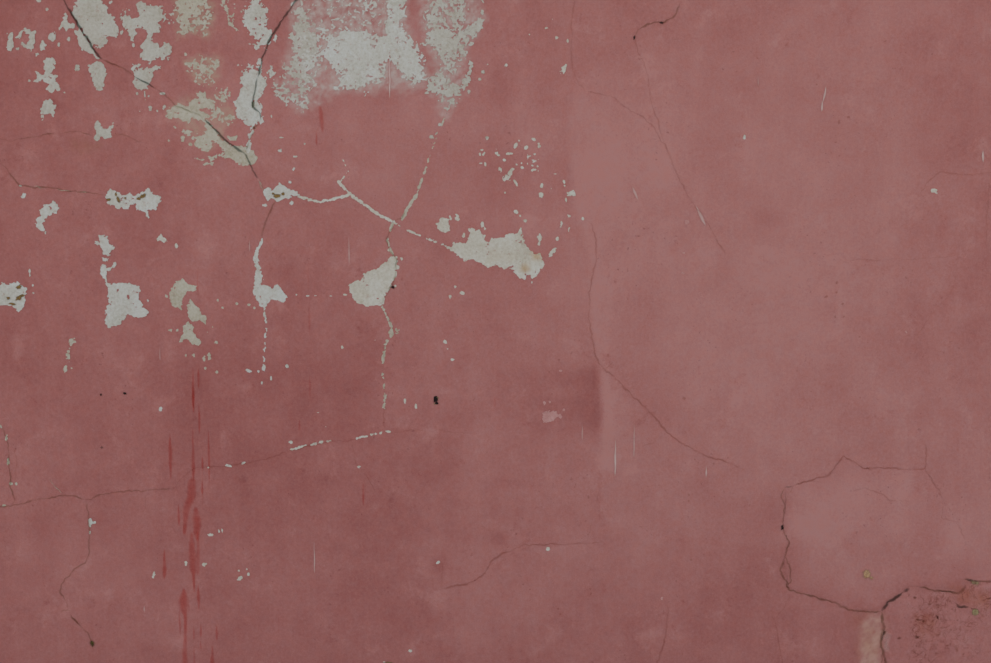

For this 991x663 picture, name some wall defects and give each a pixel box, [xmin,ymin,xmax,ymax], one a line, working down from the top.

crack [70,11,99,57]
peeling [6,0,493,166]
peeling [0,269,34,312]
peeling [95,235,149,328]
peeling [105,188,162,219]
peeling [165,278,218,374]
peeling [235,238,317,384]
peeling [330,248,403,307]
crack [298,118,451,256]
crack [356,305,400,440]
peeling [446,210,584,283]
crack [289,412,331,451]